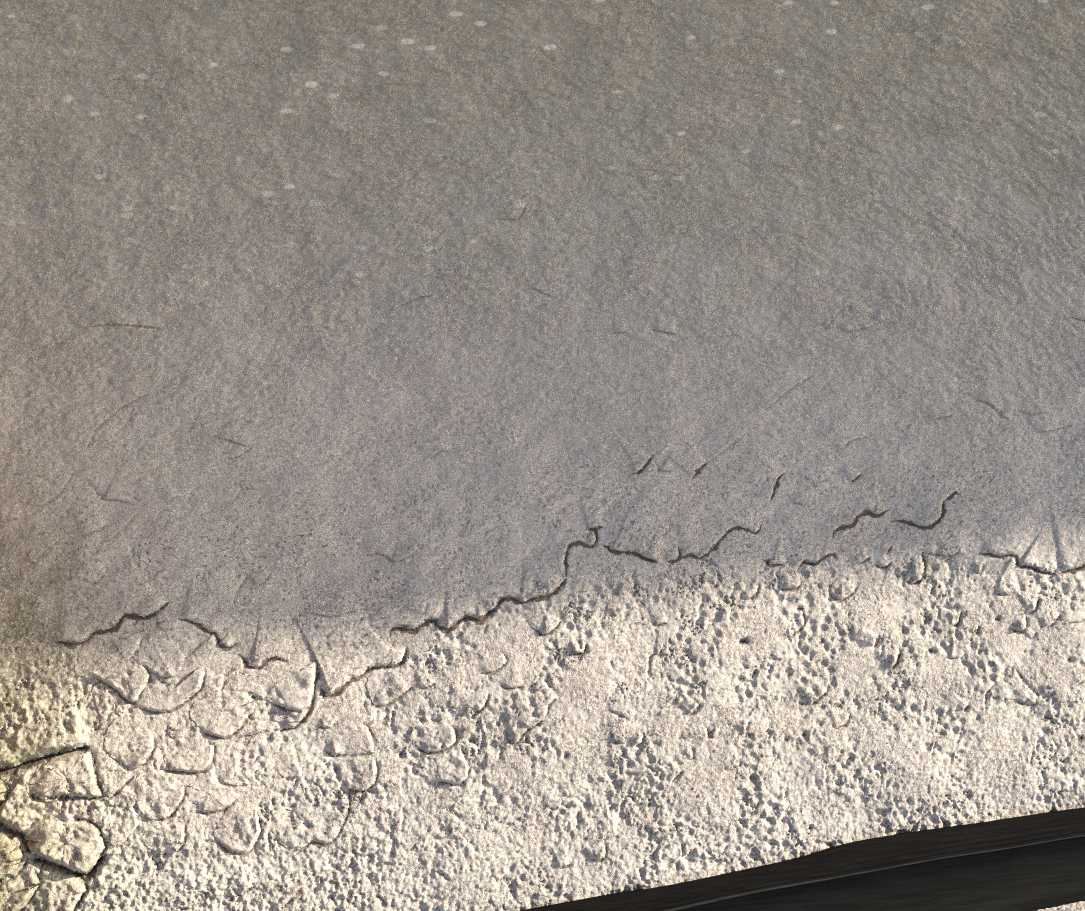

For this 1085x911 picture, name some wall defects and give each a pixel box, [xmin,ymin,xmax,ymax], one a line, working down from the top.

crack [321,491,1085,699]
crack [53,602,288,670]
crack [0,746,89,778]
crack [0,821,107,881]